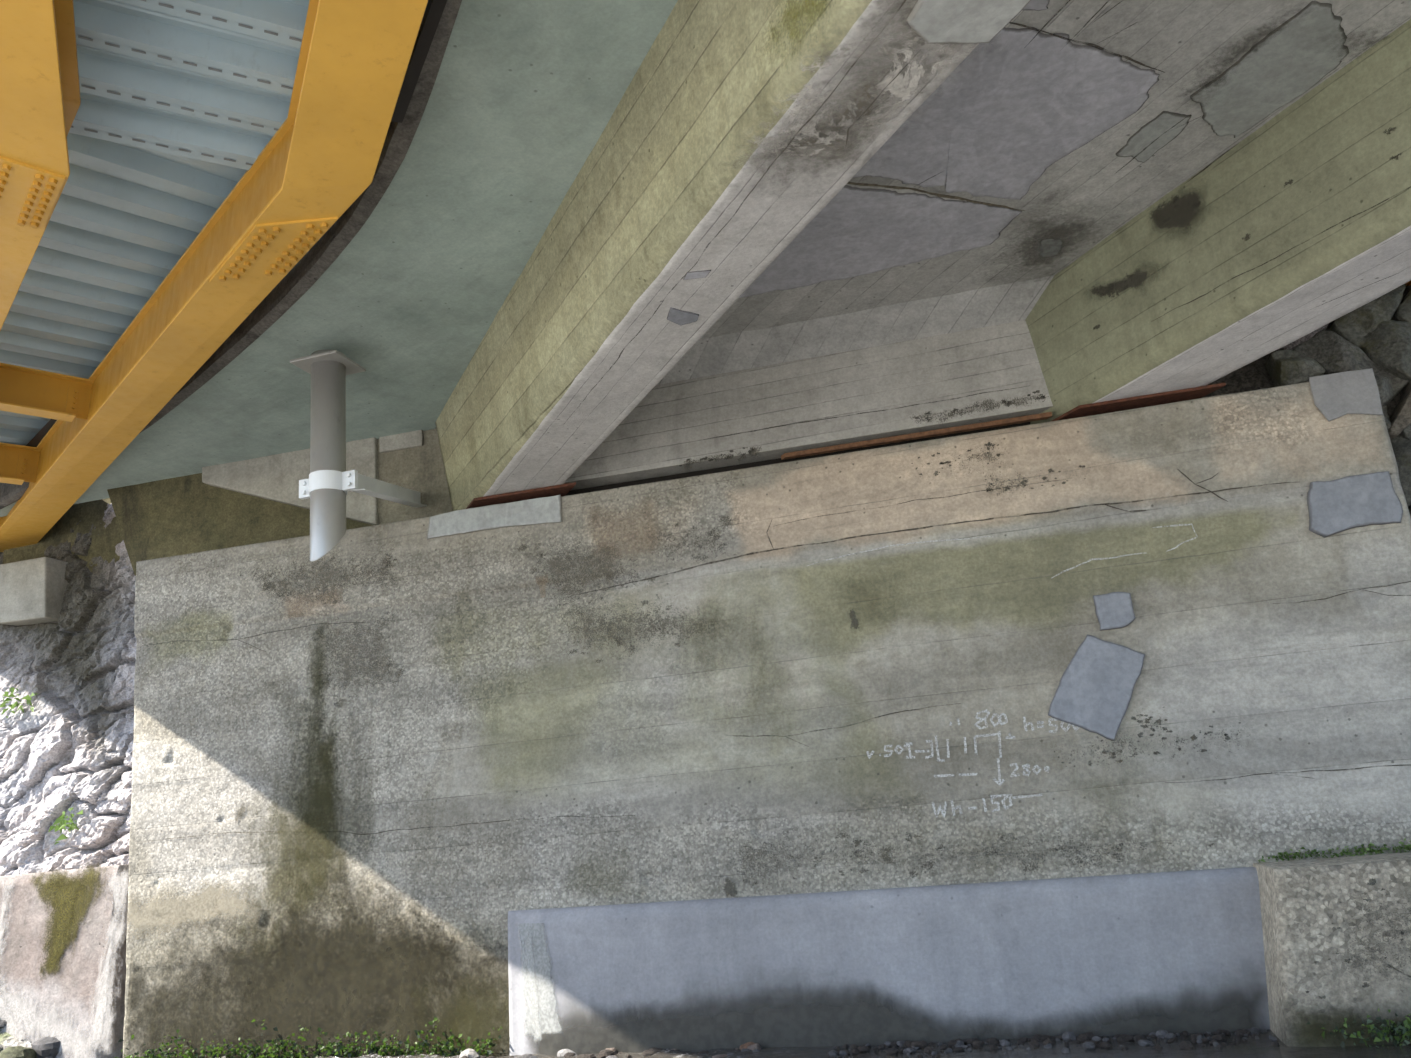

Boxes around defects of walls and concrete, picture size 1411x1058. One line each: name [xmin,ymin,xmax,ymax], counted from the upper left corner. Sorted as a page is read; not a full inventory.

crack [847,171,1025,211]
spalling [910,390,1049,423]
water stain [313,646,323,696]
water stain [0,718,1261,1058]